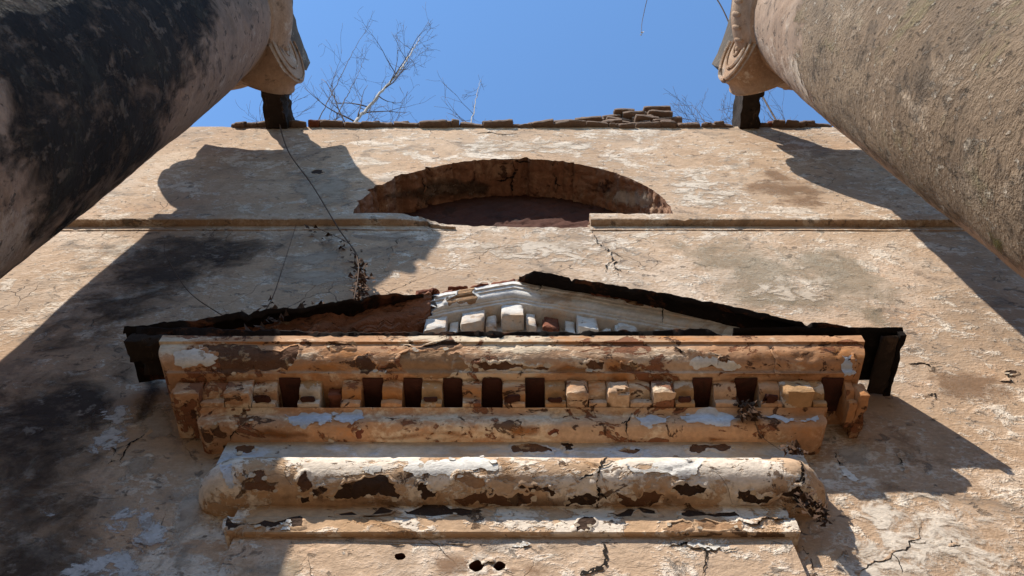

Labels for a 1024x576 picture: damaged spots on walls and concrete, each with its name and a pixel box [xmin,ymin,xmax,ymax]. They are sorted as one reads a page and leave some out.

crack [589,230,622,277]
peeling [415,279,522,308]
peeling [749,283,837,307]
peeling [173,342,304,378]
peeling [324,339,551,381]
crack [108,429,153,465]
peeling [286,409,366,443]
peeling [507,427,575,456]
peeling [636,407,736,429]
peeling [222,442,807,551]
crack [580,541,609,576]
crack [853,526,961,576]